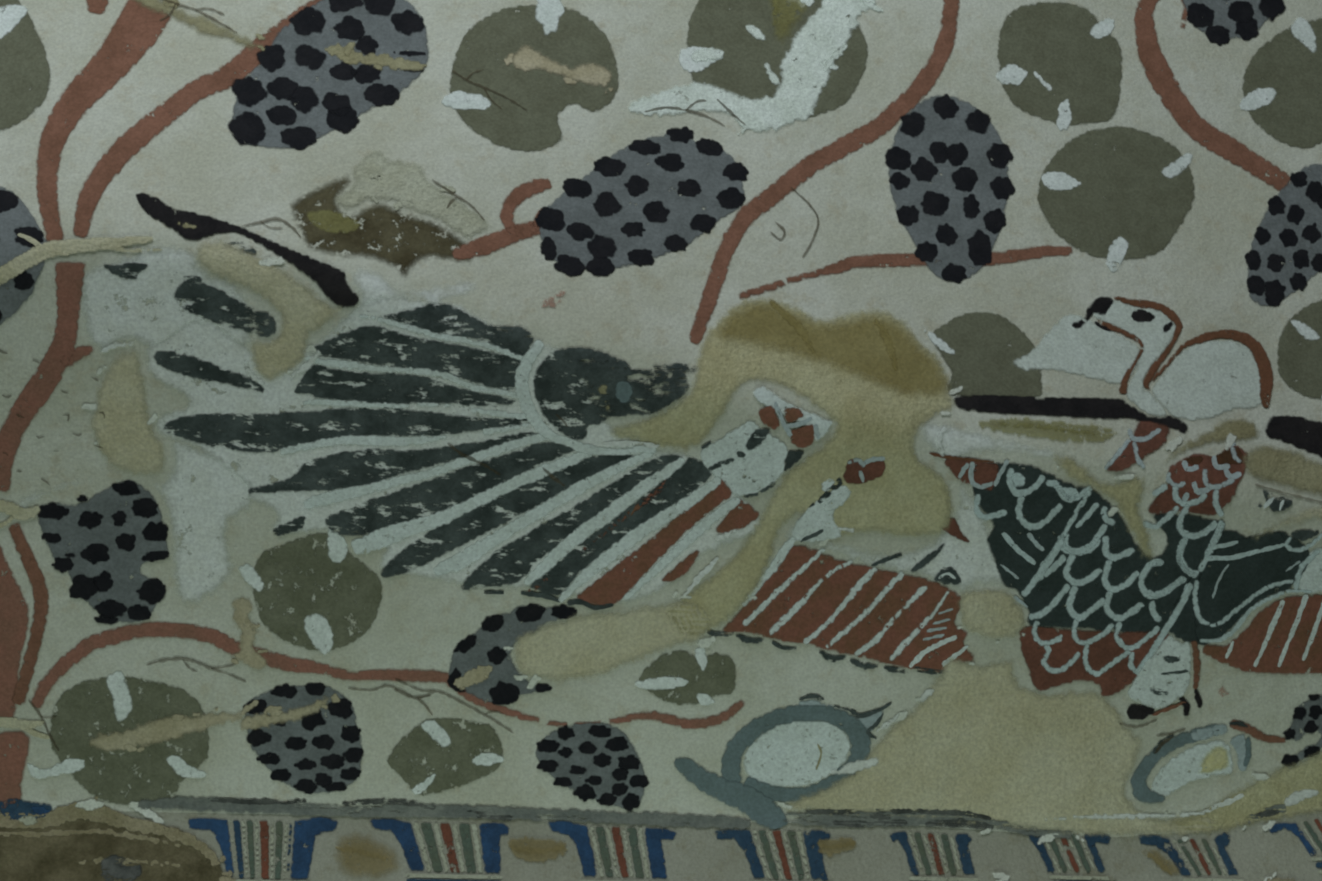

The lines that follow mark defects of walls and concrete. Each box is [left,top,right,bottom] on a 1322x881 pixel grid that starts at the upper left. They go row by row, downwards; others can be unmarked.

peeling [628,0,876,135]
flaking render [0,796,235,881]